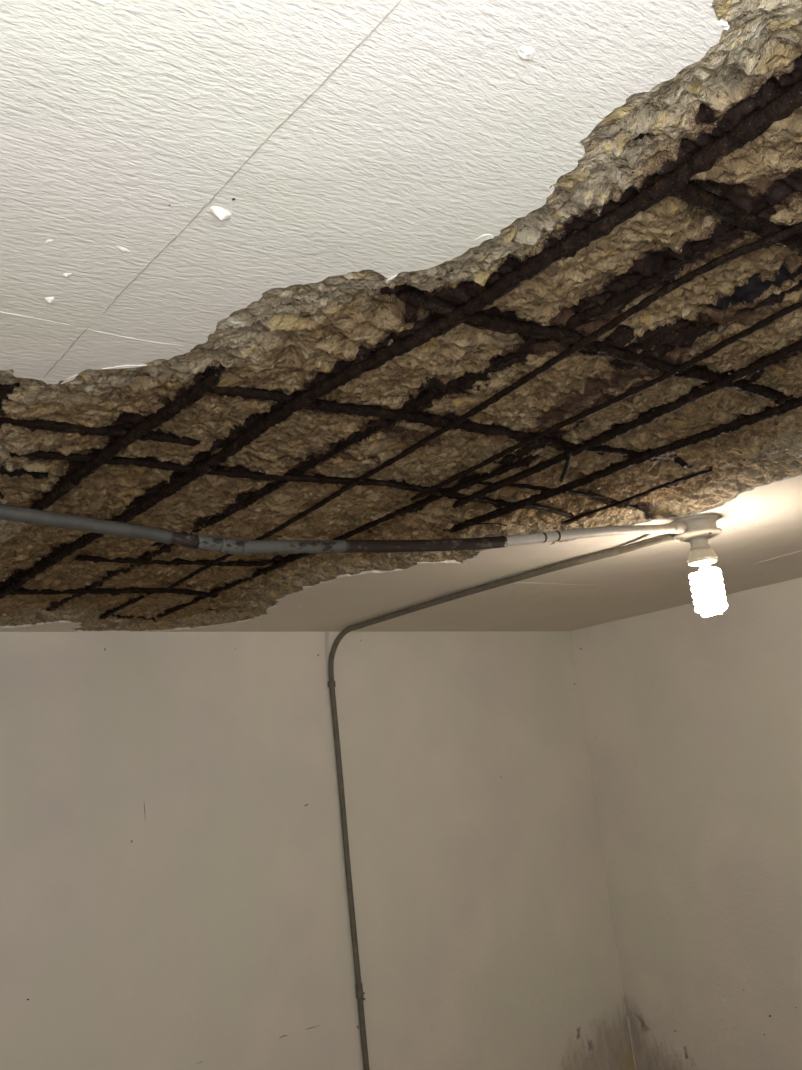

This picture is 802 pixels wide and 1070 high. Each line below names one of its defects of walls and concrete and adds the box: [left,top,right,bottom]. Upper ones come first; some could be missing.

rust [0,56,802,533]
spalling [0,0,802,631]
rust [0,532,98,589]
rust [42,542,197,623]